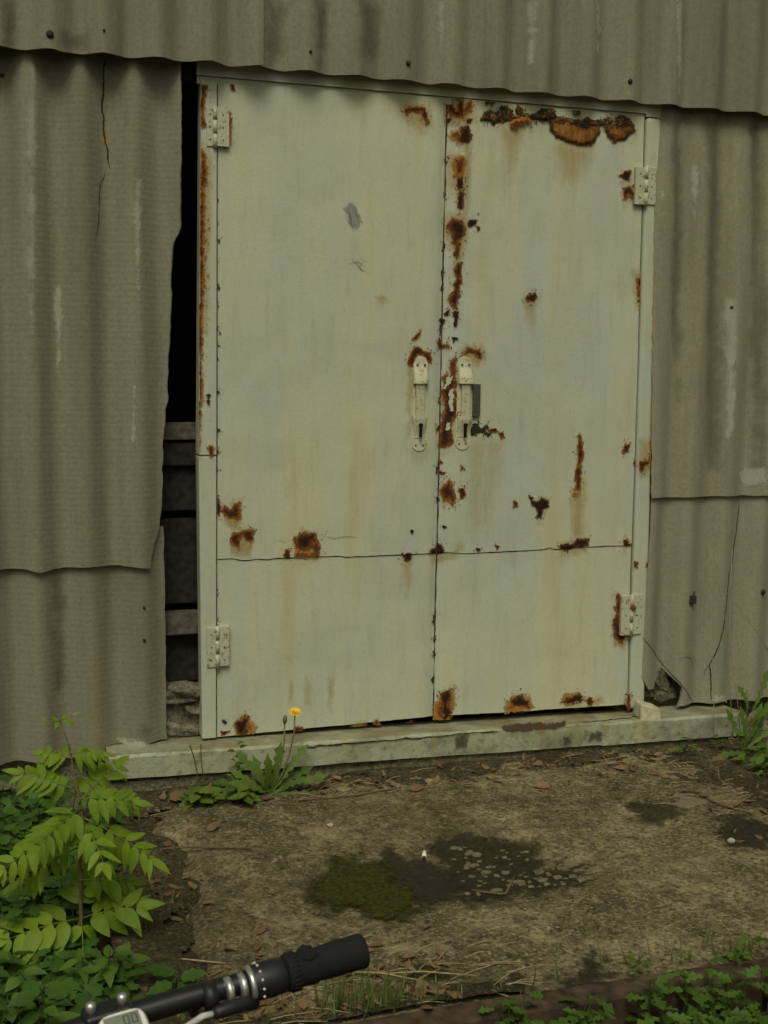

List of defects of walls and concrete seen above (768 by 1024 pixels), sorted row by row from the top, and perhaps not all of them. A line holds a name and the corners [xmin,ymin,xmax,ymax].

crack [97,55,110,232]
corrosion [198,148,216,457]
corrosion [400,97,485,511]
corrosion [217,495,259,553]
corrosion [278,530,323,561]
corrosion [555,433,591,553]
corrosion [611,592,627,645]
crack [644,509,739,702]
corrosion [220,709,258,737]
corrosion [431,684,460,720]
corrosion [503,688,540,714]
damp [365,847,485,912]